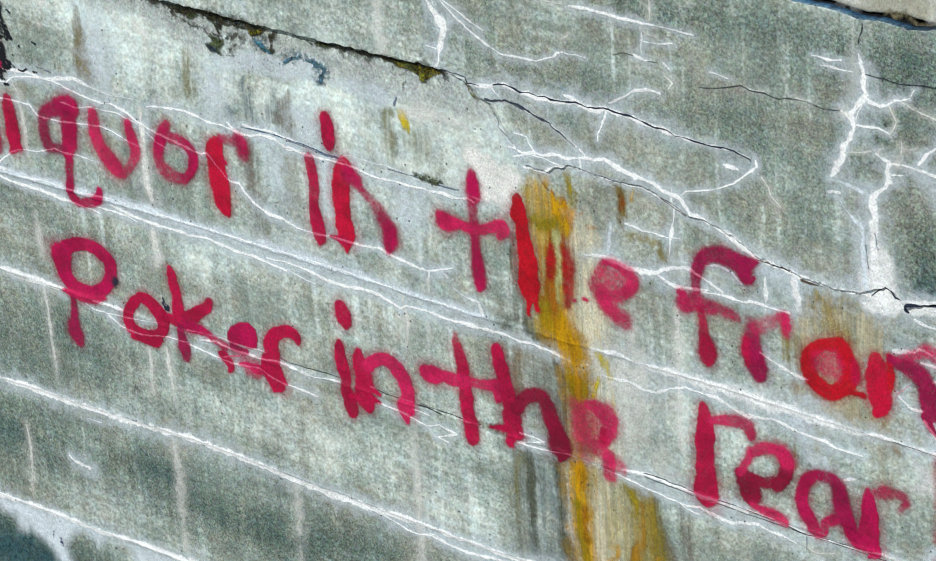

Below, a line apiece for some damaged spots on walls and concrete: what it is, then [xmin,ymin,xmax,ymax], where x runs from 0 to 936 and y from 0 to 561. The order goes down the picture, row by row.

crack [0,65,467,205]
rust [610,181,634,221]
crack [425,0,936,384]
crack [0,148,864,458]
rust [525,165,616,414]
crack [897,386,923,414]
rust [570,441,667,561]
crack [517,430,886,561]